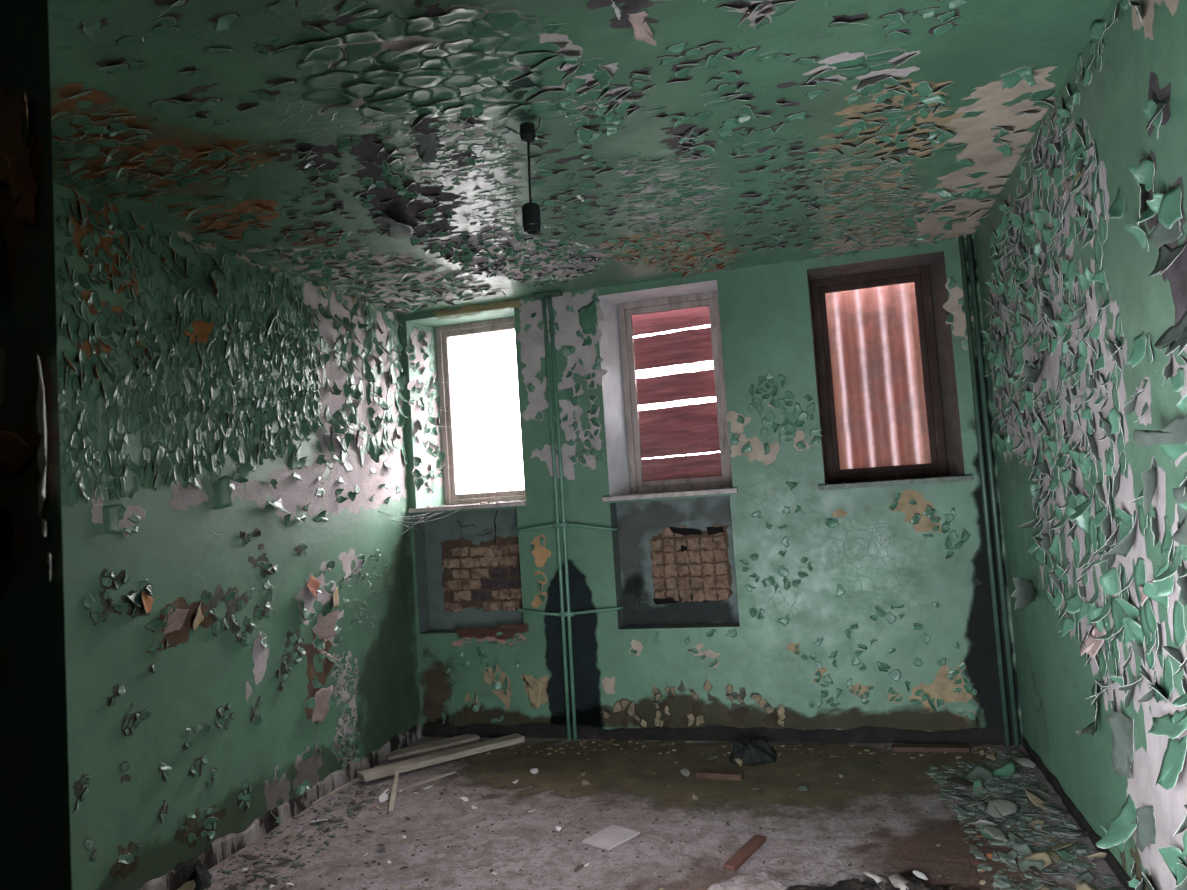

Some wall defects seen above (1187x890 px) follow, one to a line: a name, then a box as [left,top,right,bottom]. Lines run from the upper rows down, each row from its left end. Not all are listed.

peeling [810,0,968,39]
peeling [1075,0,1179,86]
peeling [51,0,824,538]
peeling [34,348,57,537]
peeling [754,49,1187,890]
spalling [440,534,551,612]
spalling [649,505,813,605]
spalling [83,528,389,848]
peeling [71,774,91,814]
leakage [423,695,996,817]
peeling [109,841,142,880]